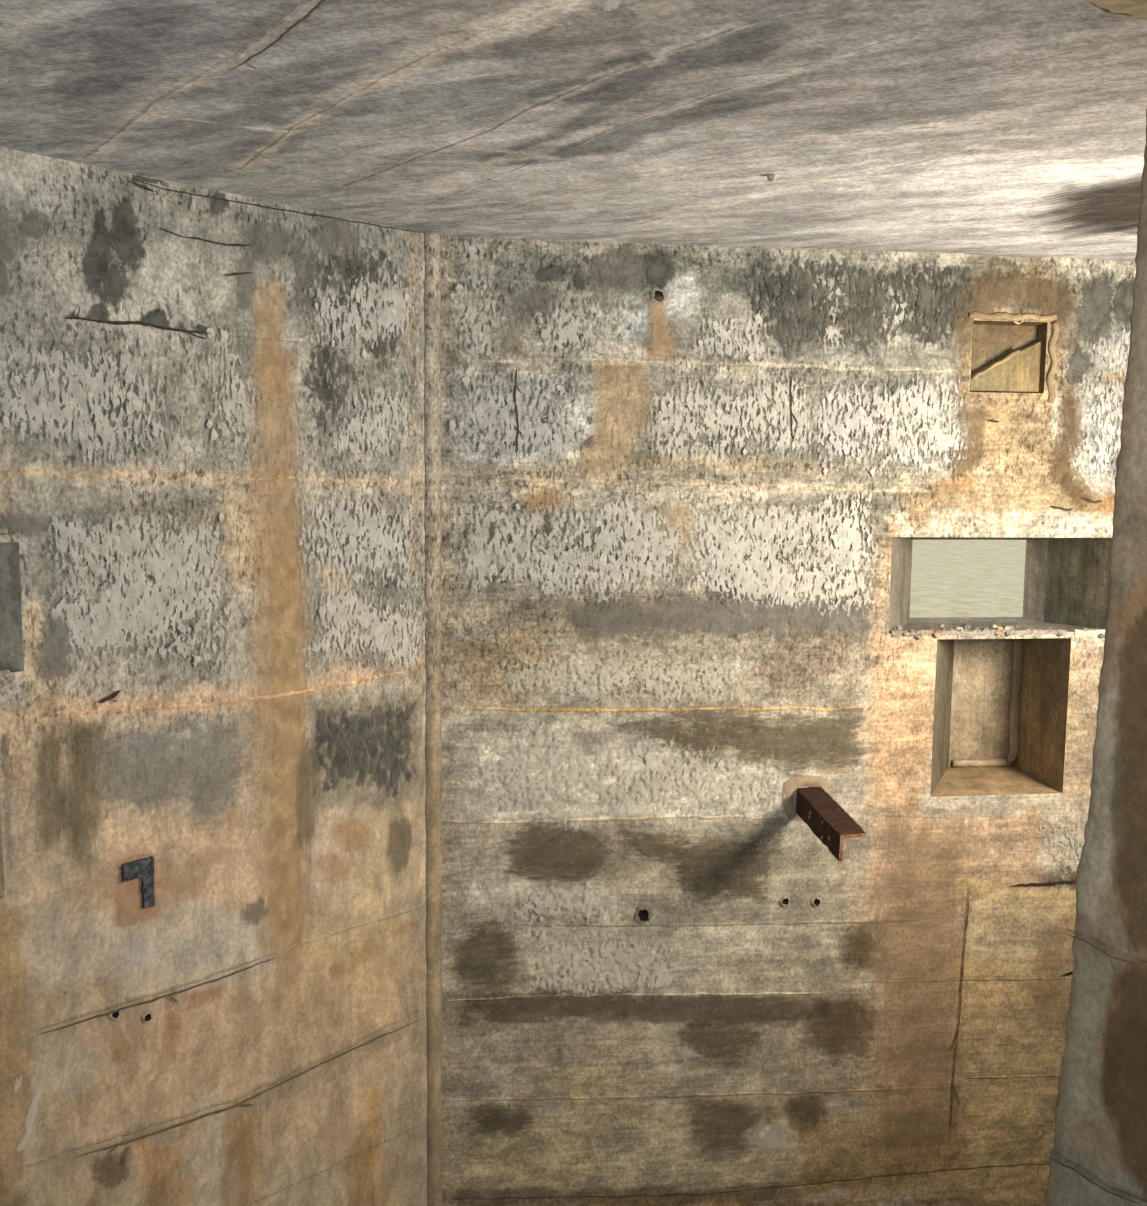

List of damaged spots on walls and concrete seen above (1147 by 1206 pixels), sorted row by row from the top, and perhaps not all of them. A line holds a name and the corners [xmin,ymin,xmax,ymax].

crack [229,0,326,70]
leakage [210,192,228,218]
leakage [68,197,146,324]
crack [63,308,212,339]
leakage [141,309,209,335]
leakage [314,699,417,798]
crack [1010,878,1076,886]
leakage [477,990,796,1060]
leakage [813,1000,870,1051]